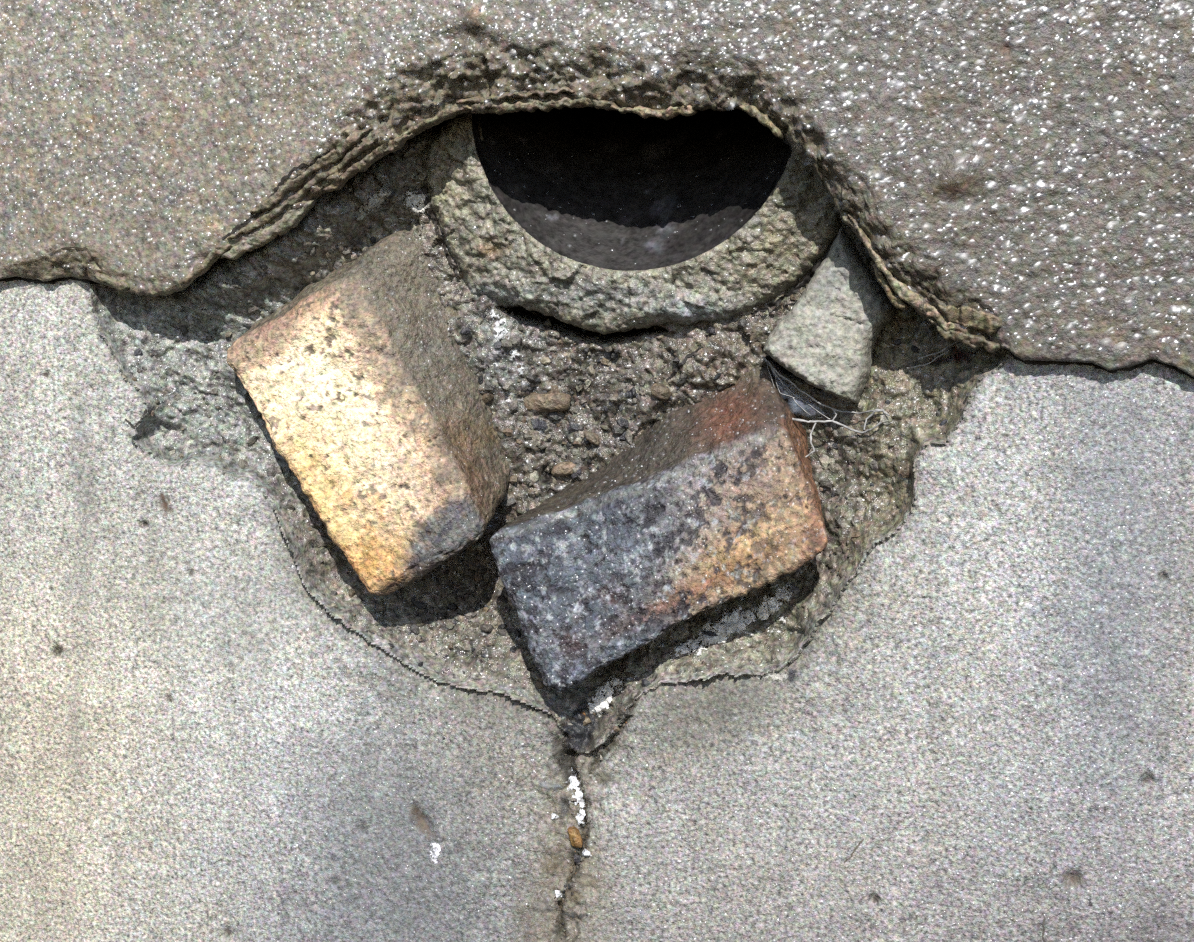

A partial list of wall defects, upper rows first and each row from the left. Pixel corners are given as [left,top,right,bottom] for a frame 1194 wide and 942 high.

spalling [89,86,1012,754]
efflorescence [673,585,793,657]
crack [528,690,641,942]